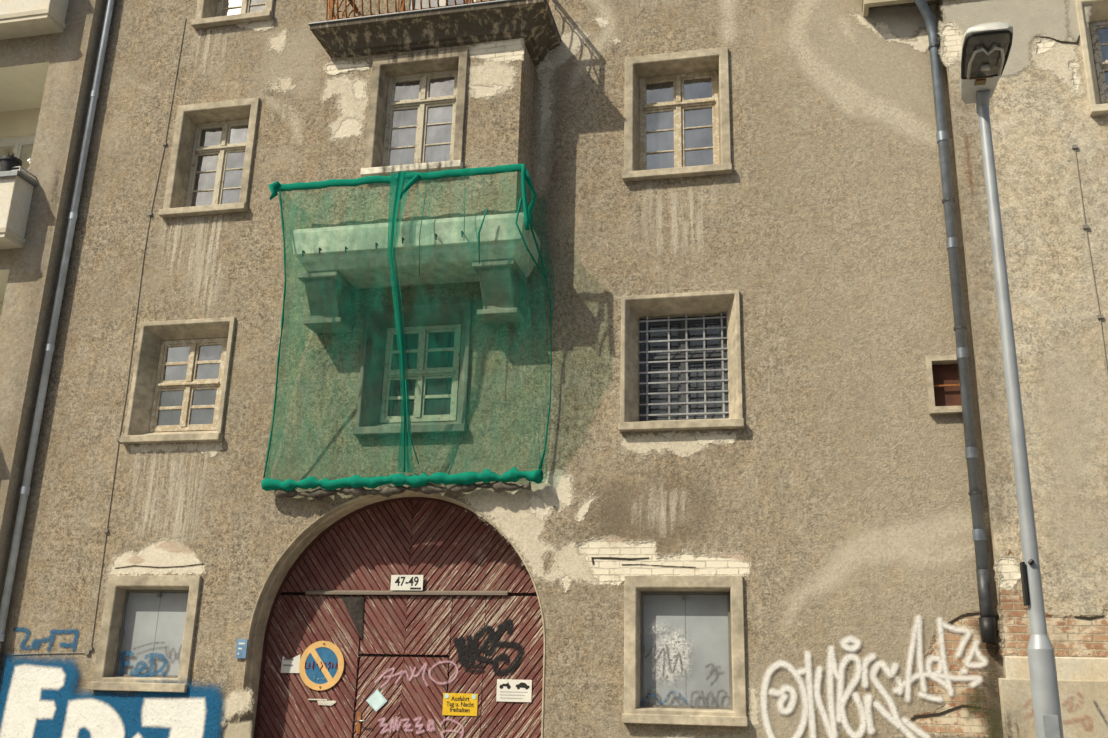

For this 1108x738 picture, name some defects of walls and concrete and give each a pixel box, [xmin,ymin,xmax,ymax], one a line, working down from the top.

flaking render [320,61,370,142]
flaking render [466,38,524,101]
flaking render [536,26,591,140]
flaking render [849,0,1091,98]
flaking render [619,429,741,458]
flaking render [107,537,206,576]
flaking render [459,469,751,593]
flaking render [887,549,1031,738]
flaking render [1045,600,1108,658]